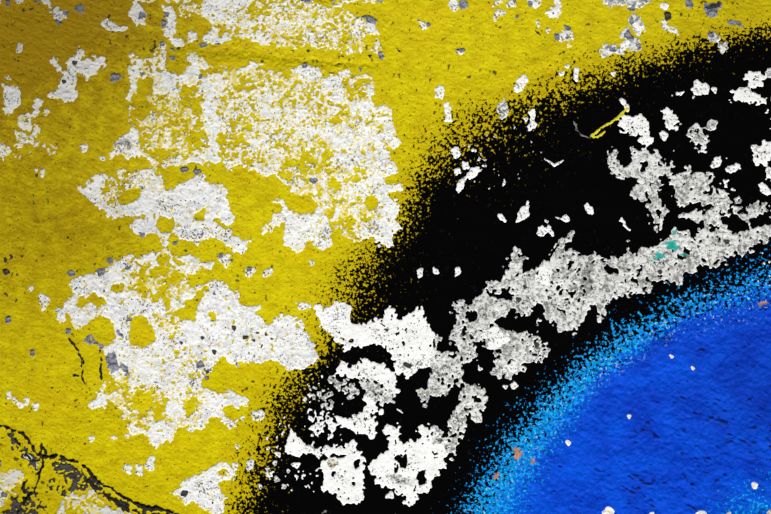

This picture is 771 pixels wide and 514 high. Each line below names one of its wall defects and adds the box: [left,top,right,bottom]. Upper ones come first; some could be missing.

peeling [527,0,574,48]
peeling [599,0,679,58]
peeling [707,31,729,53]
peeling [0,46,107,161]
peeling [434,85,453,122]
peeling [672,79,717,99]
peeling [28,0,403,476]
peeling [265,98,771,507]
crack [68,338,103,384]
peeling [0,433,47,514]
crack [0,425,179,514]
peeling [48,459,152,514]